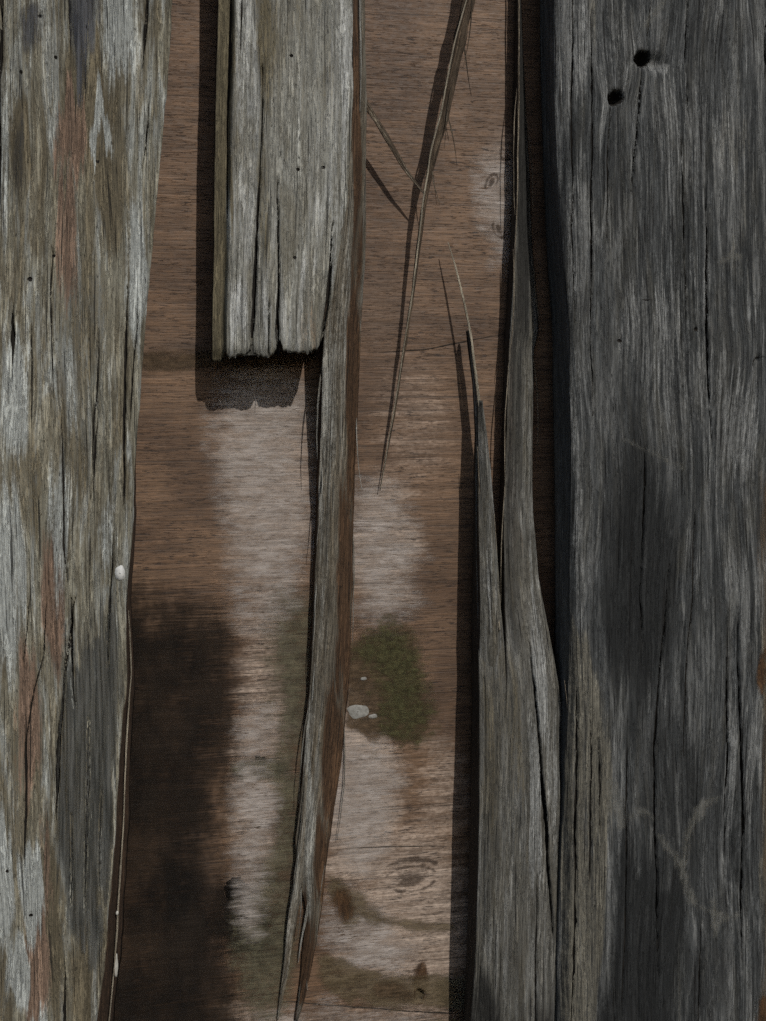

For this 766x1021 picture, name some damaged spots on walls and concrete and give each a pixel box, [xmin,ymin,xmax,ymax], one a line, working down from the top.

crack [570,0,641,419]
water stain [319,881,465,1010]
crack [531,669,601,1021]
crack [723,658,745,950]